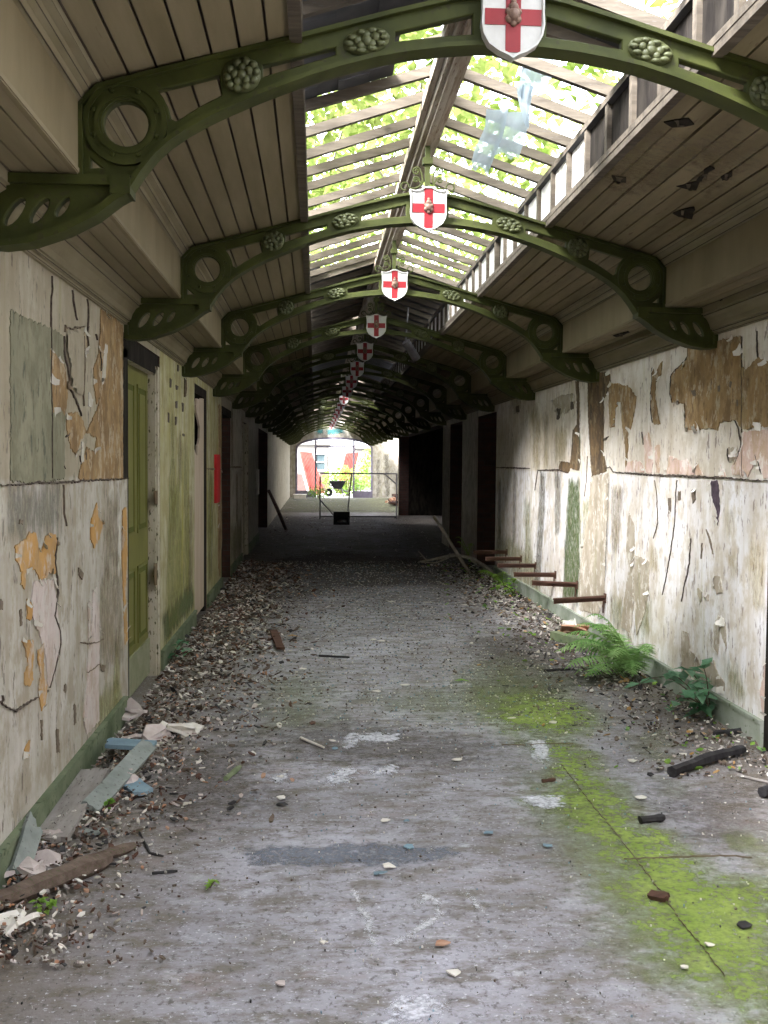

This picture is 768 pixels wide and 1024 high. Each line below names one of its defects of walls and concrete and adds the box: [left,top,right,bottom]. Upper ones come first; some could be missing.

flaking render [9,309,123,484]
peeling [90,503,105,549]
leakage [514,474,581,605]
leakage [604,490,621,581]
peeling [621,511,650,636]
peeling [551,335,768,615]
peeling [14,519,67,760]
peeling [73,587,106,734]
peeling [680,615,727,694]
flaking render [758,658,766,716]
crack [501,743,752,977]